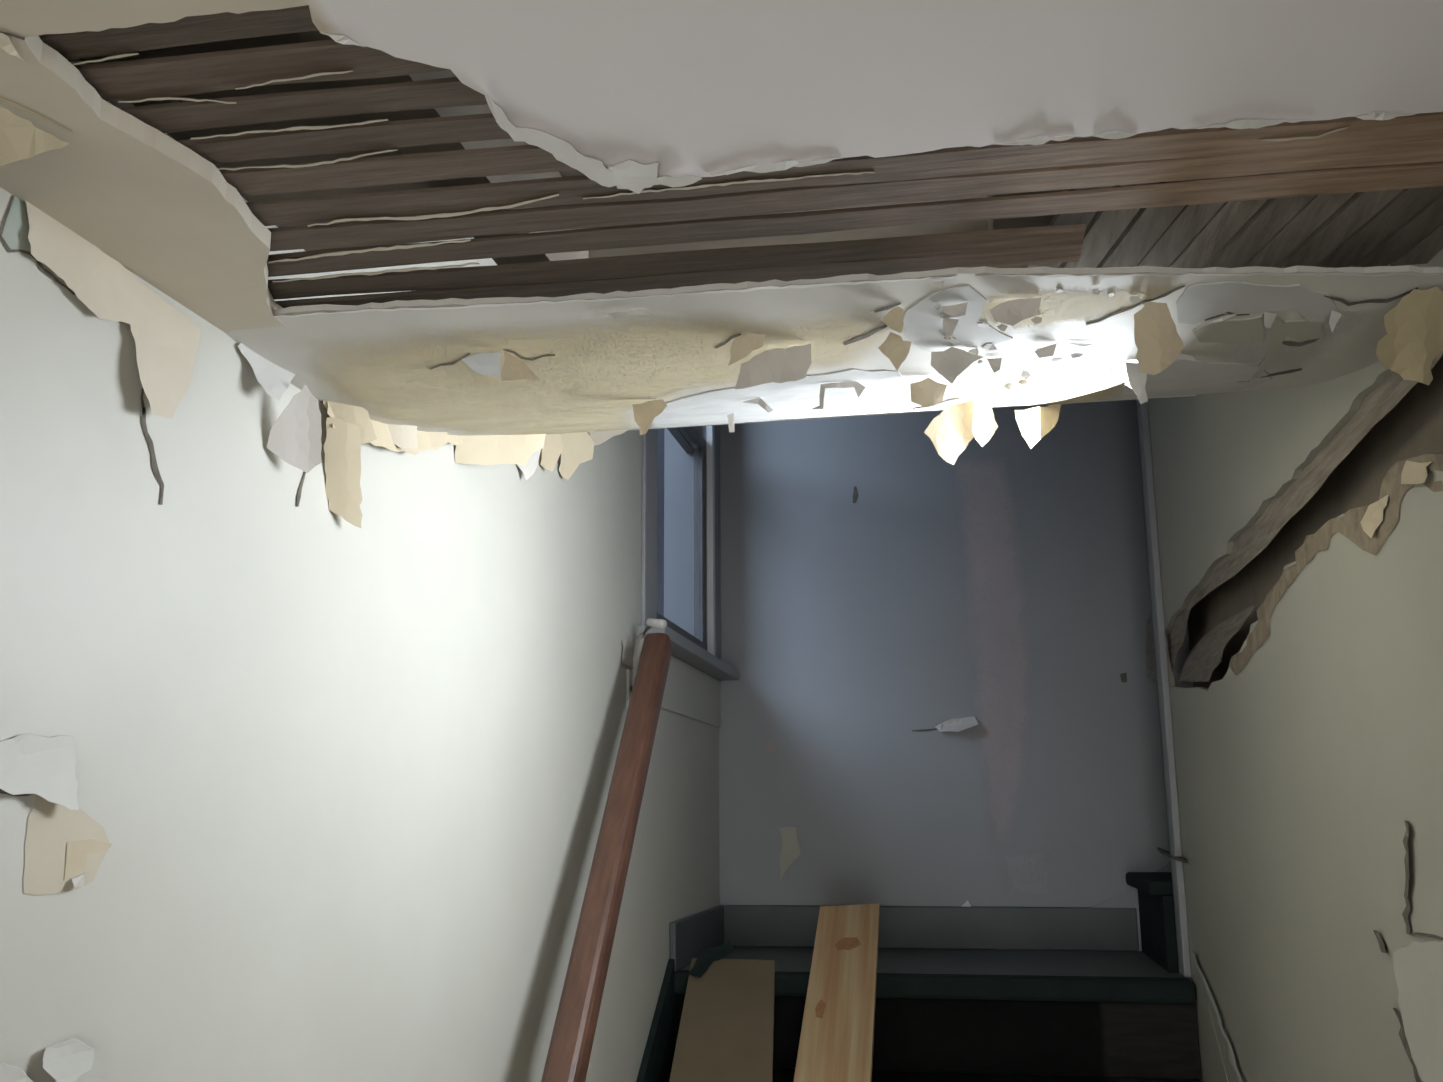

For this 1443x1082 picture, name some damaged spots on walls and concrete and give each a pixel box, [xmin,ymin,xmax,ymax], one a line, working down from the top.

crack [141,388,164,505]
peeling [238,272,1443,528]
spalling [1229,453,1443,675]
peeling [0,734,113,895]
peeling [0,1038,102,1082]
peeling [1373,820,1443,1082]